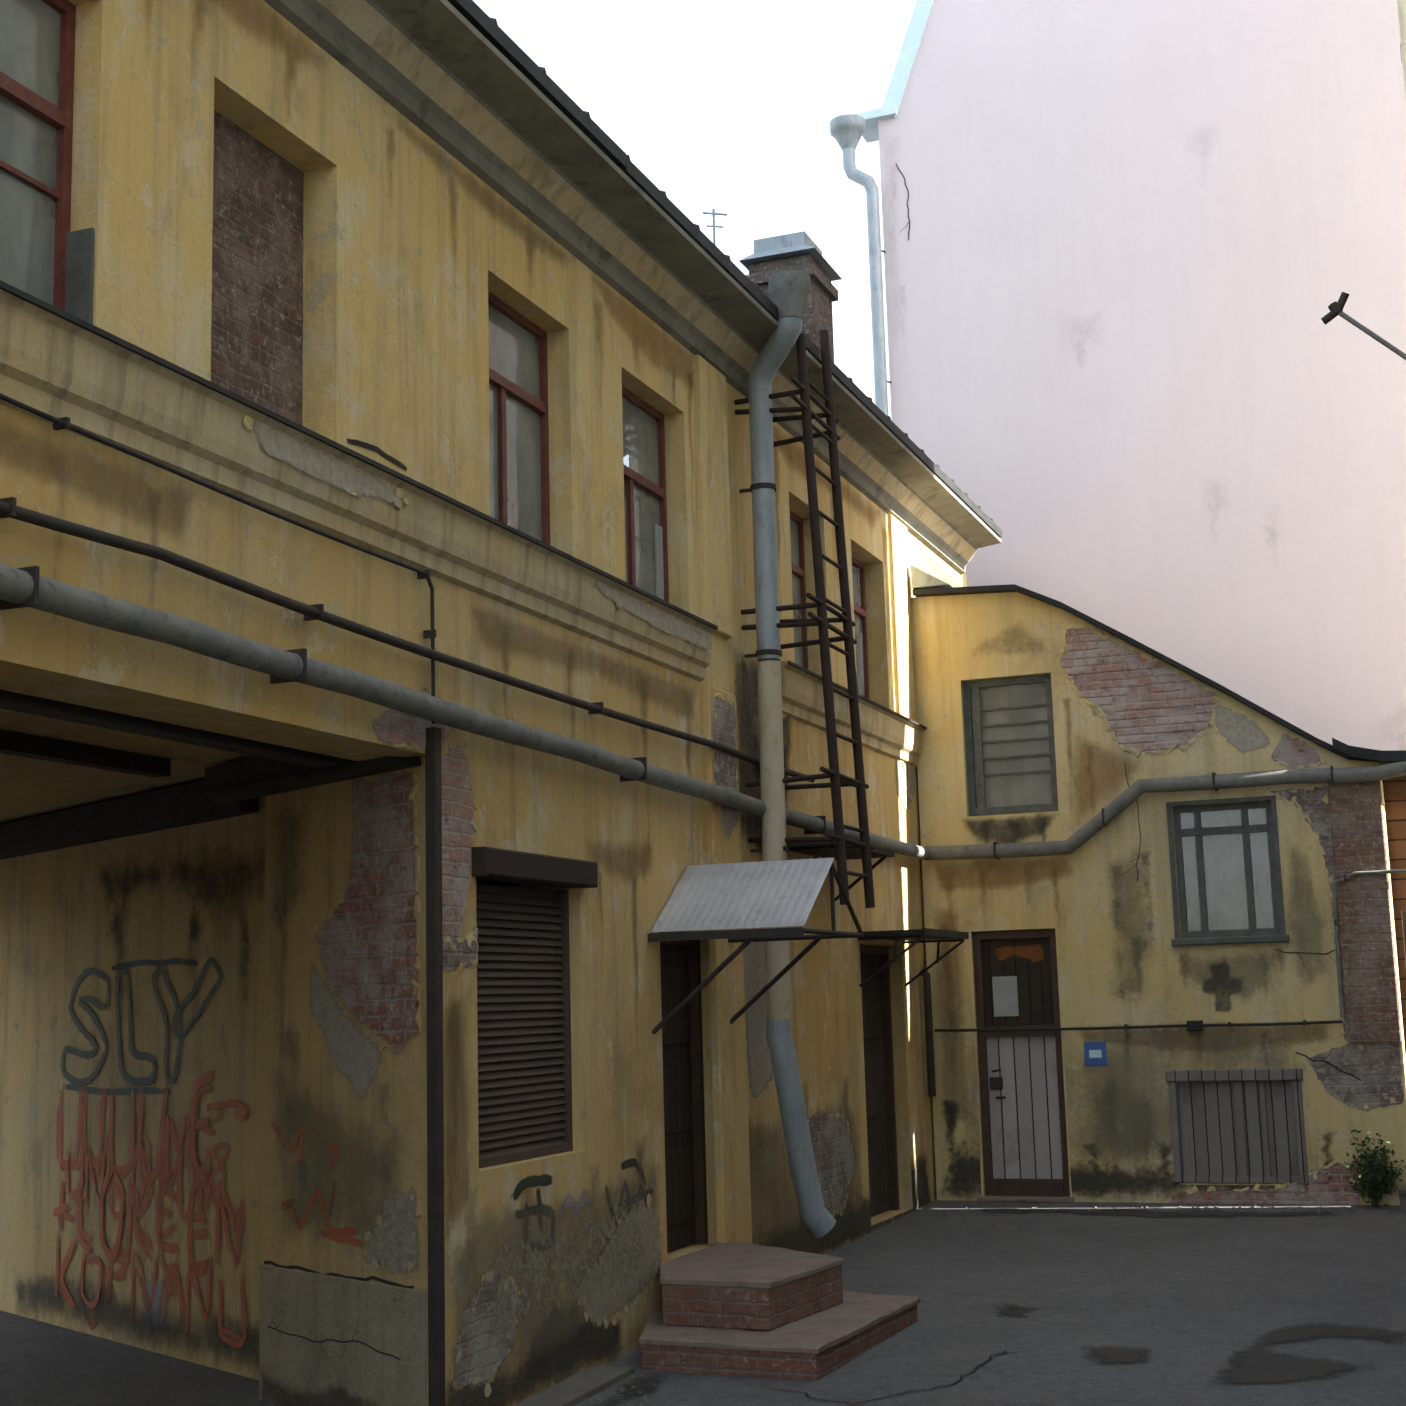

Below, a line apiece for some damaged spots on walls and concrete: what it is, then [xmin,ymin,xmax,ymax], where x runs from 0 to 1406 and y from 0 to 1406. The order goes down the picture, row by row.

spalling [313,706,479,1055]
leakage [967,816,1052,844]
spalling [1056,624,1406,1112]
peeling [363,1185,421,1275]
peeling [574,1194,662,1329]
spalling [807,1106,856,1217]
leakage [749,1133,931,1254]
leakage [944,1088,1396,1218]
crack [268,1317,401,1365]
spalling [450,1267,520,1397]